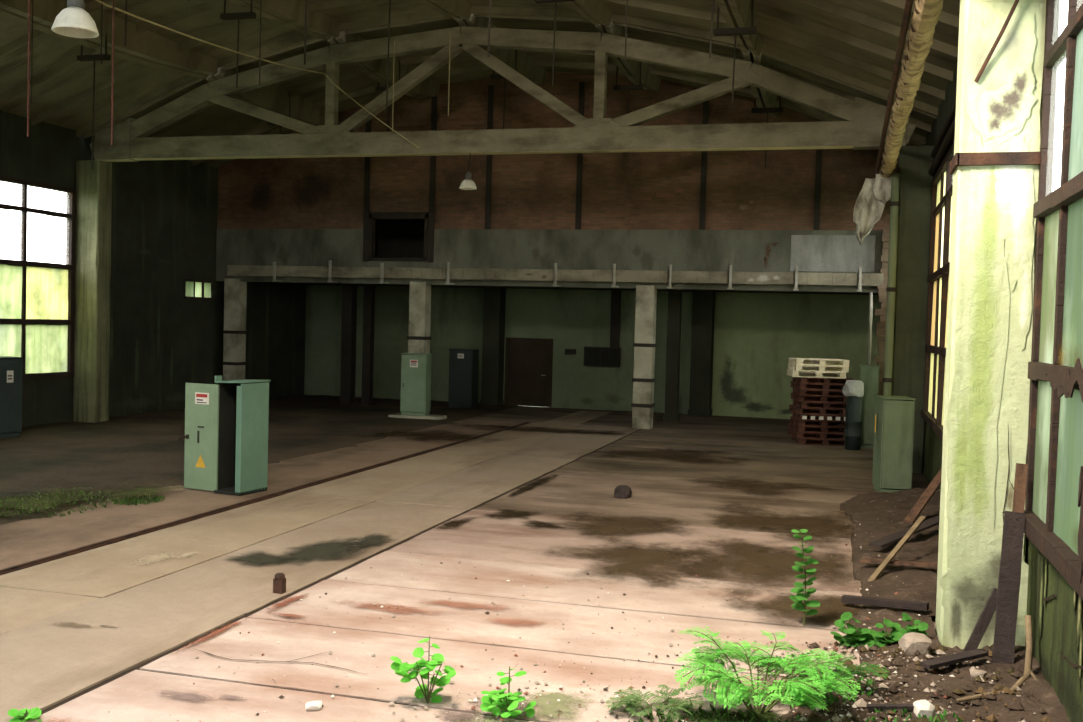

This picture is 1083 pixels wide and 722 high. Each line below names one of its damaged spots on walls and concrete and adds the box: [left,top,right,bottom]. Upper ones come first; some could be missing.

water stain [227,535,390,565]